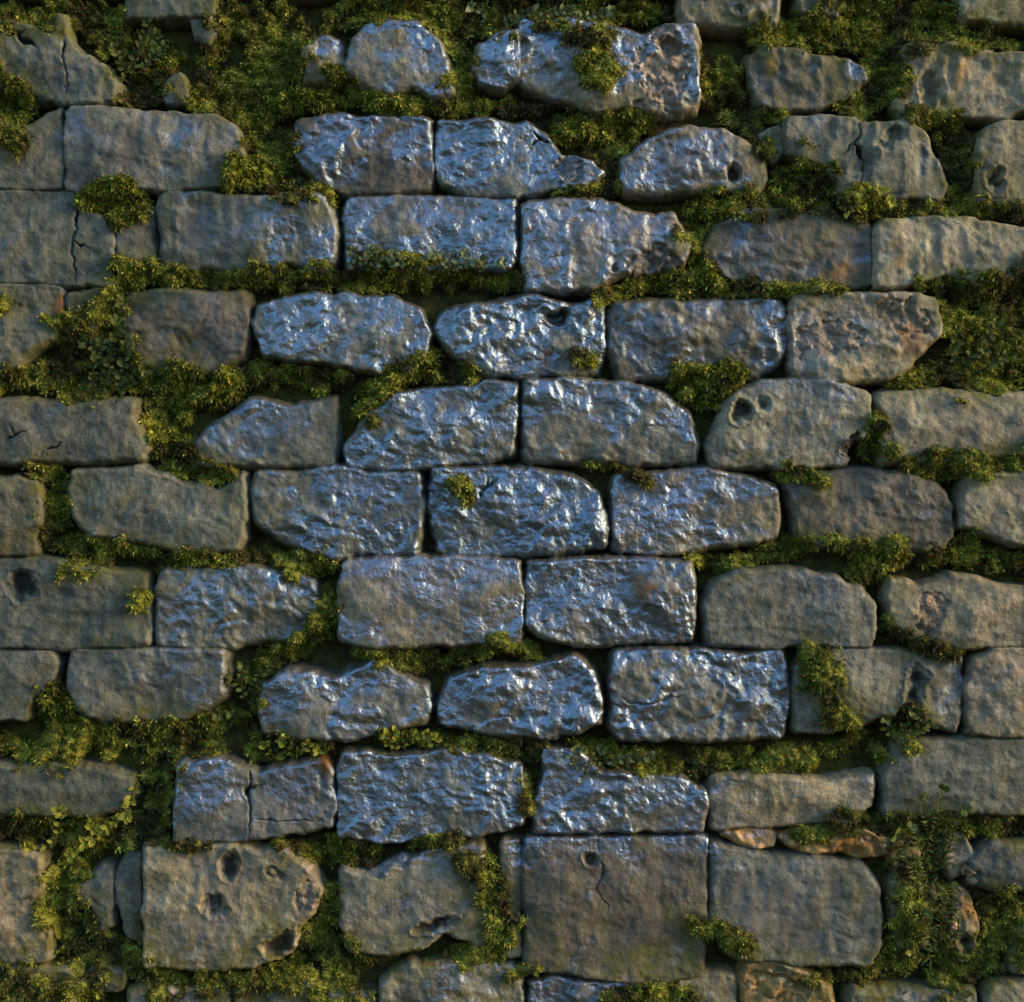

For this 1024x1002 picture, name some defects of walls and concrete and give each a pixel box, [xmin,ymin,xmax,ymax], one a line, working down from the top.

crack [853,142,862,160]